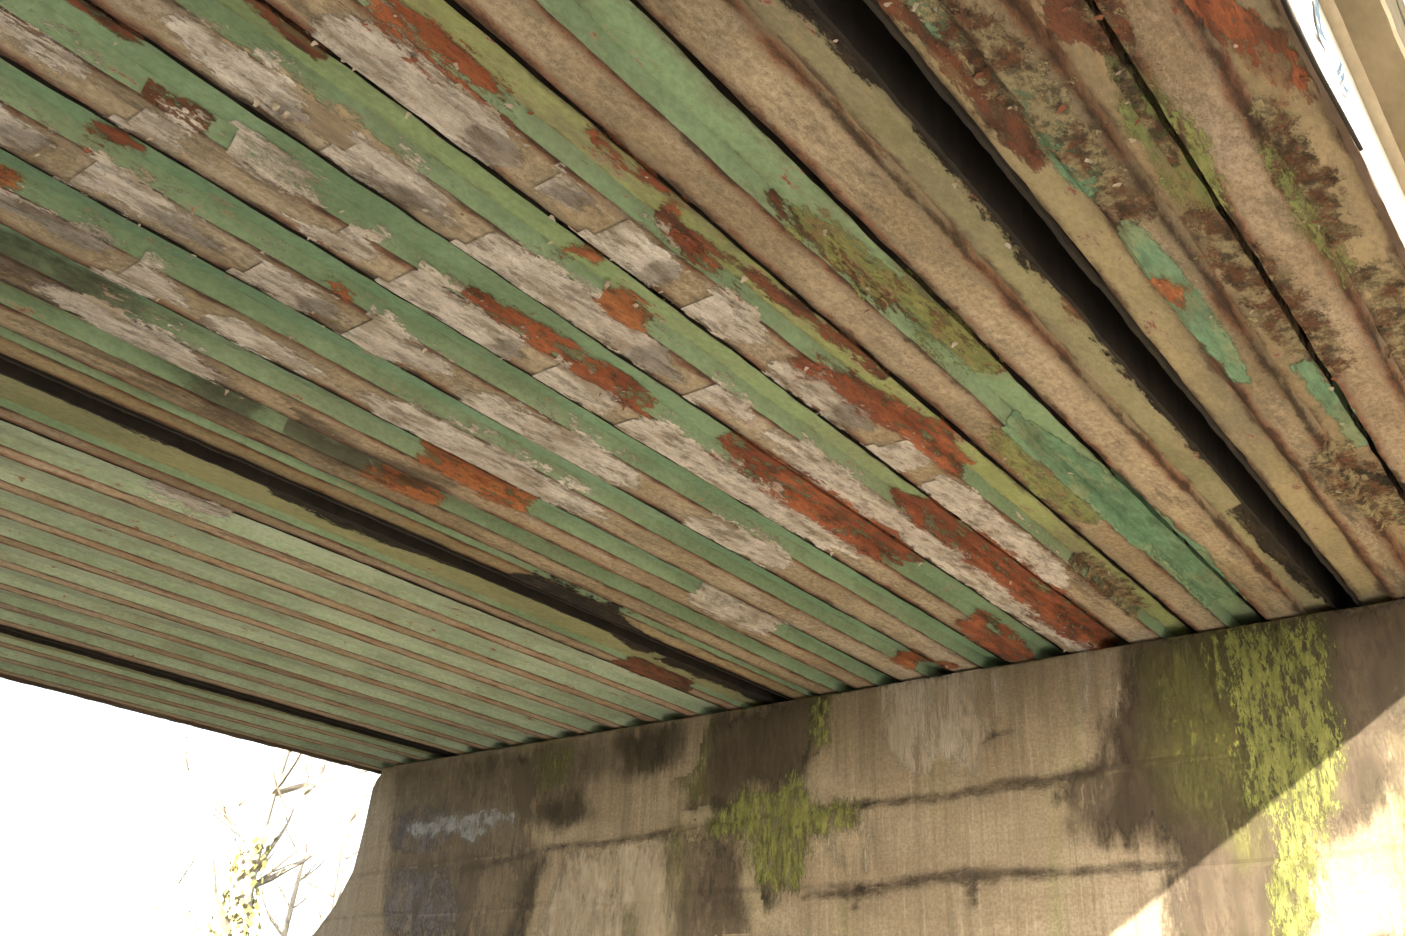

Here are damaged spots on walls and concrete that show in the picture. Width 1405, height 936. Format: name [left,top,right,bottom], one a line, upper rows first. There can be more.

peeling [0,85,65,157]
peeling [0,0,108,88]
peeling [0,135,335,399]
peeling [109,0,1096,653]
damp [386,750,553,936]
damp [506,570,826,936]
damp [1054,505,1405,936]